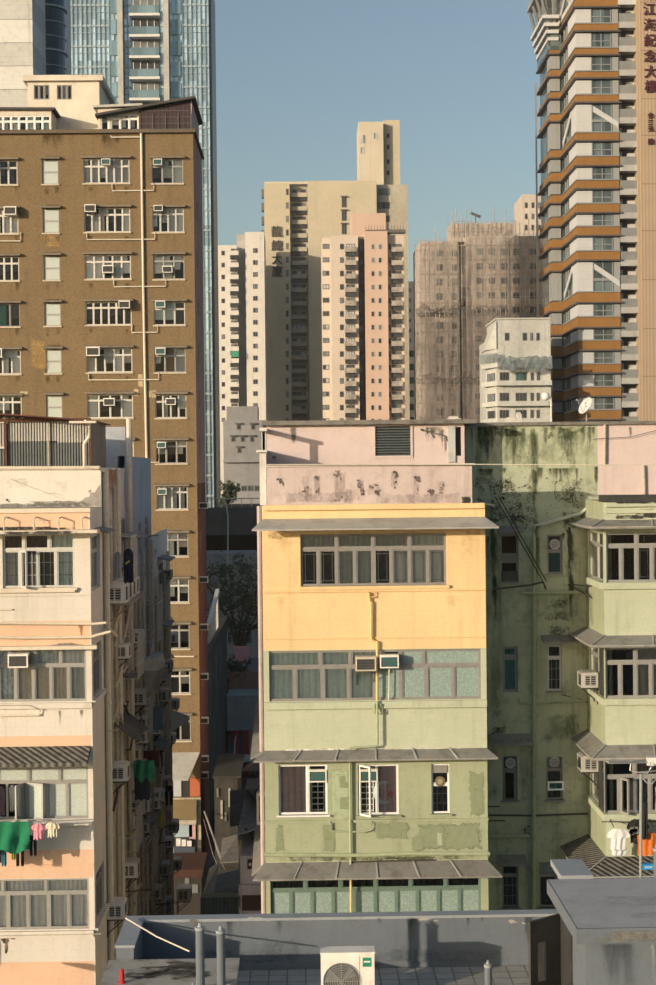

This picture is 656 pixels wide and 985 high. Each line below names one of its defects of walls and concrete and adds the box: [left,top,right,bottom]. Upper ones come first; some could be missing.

leakage [471,426,595,494]
crack [11,478,64,522]